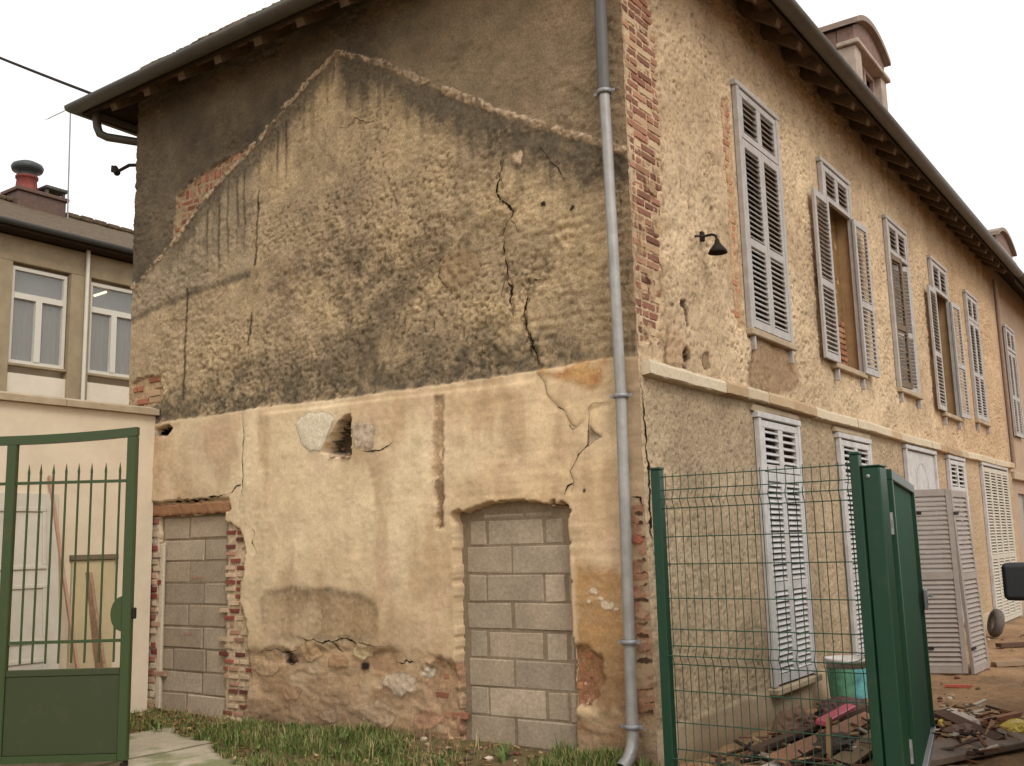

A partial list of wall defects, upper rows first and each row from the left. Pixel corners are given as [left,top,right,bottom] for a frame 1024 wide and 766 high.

flaking render [173,141,254,239]
flaking render [131,375,164,407]
spalling [296,412,392,458]
damp [154,284,582,423]
crack [438,153,603,491]
crack [641,387,655,568]
spalling [219,522,470,740]
spalling [576,645,605,706]